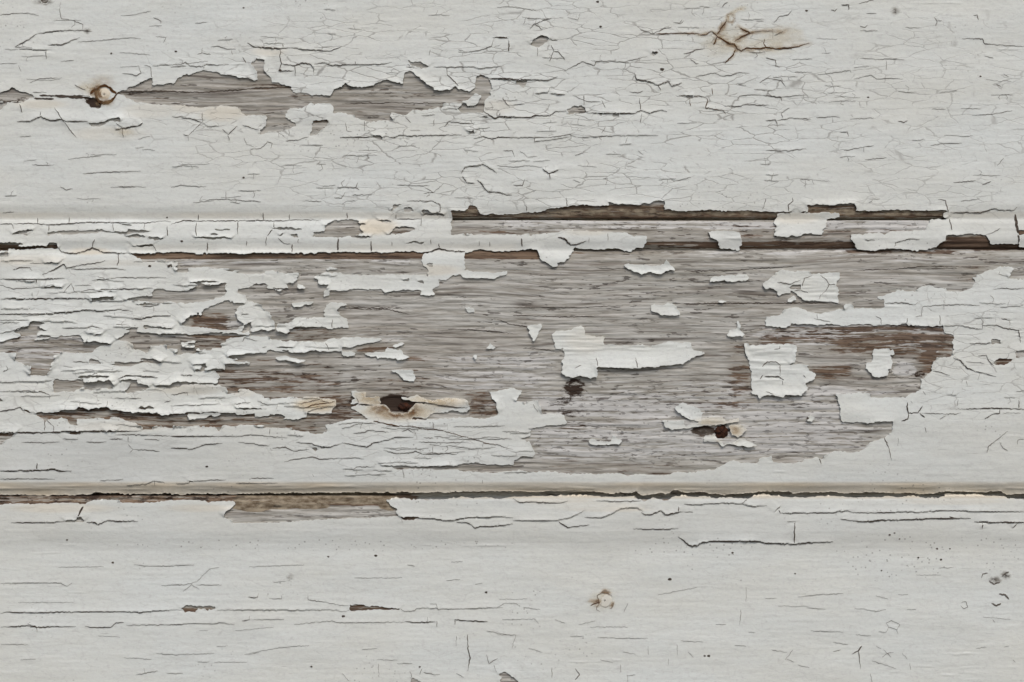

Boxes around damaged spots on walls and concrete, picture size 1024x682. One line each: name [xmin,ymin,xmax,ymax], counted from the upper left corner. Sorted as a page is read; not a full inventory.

peeling [120,58,492,140]
crack [899,15,1024,146]
crack [0,2,909,334]
crack [940,158,1019,241]
peeling [0,200,1024,476]
crack [876,272,1024,458]
crack [12,507,136,525]
peeling [222,499,419,523]
crack [421,497,1024,547]
crack [1,561,754,680]
crack [766,593,916,680]
crack [961,572,1009,621]